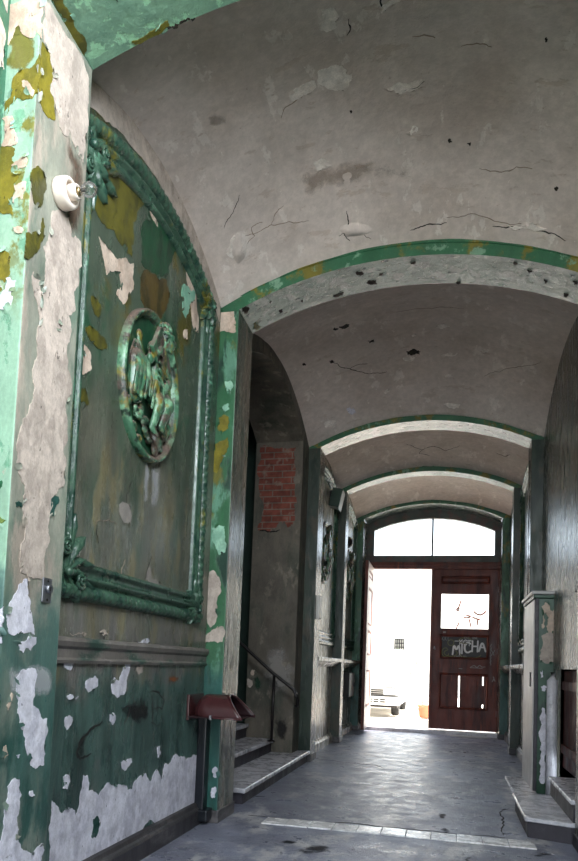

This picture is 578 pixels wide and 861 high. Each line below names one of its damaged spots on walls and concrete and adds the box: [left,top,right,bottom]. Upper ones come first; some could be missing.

peeling [131,18,195,45]
peeling [95,176,176,319]
crack [447,213,537,225]
spalling [0,0,107,653]
peeling [181,272,199,342]
spalling [0,668,48,769]
spalling [64,715,74,730]
spalling [0,746,197,861]
crack [332,809,506,838]